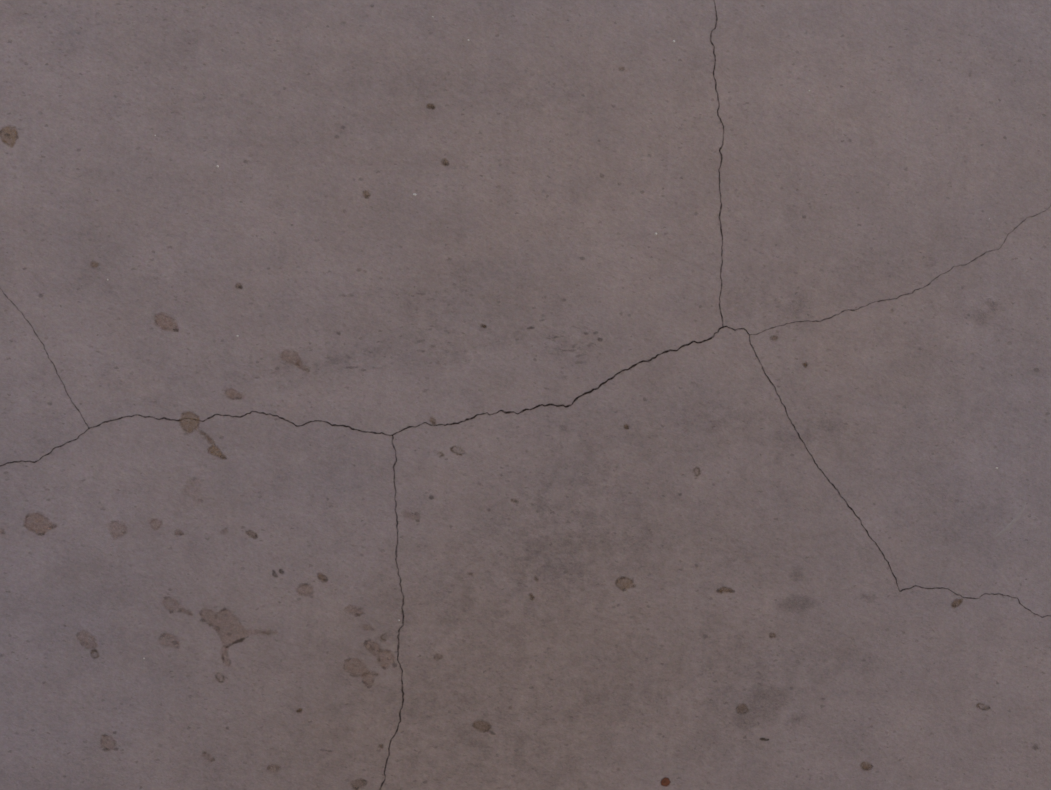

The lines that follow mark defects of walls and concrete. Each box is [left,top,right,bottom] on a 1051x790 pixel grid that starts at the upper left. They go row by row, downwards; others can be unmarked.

crack [710,6,724,267]
crack [0,275,1048,787]